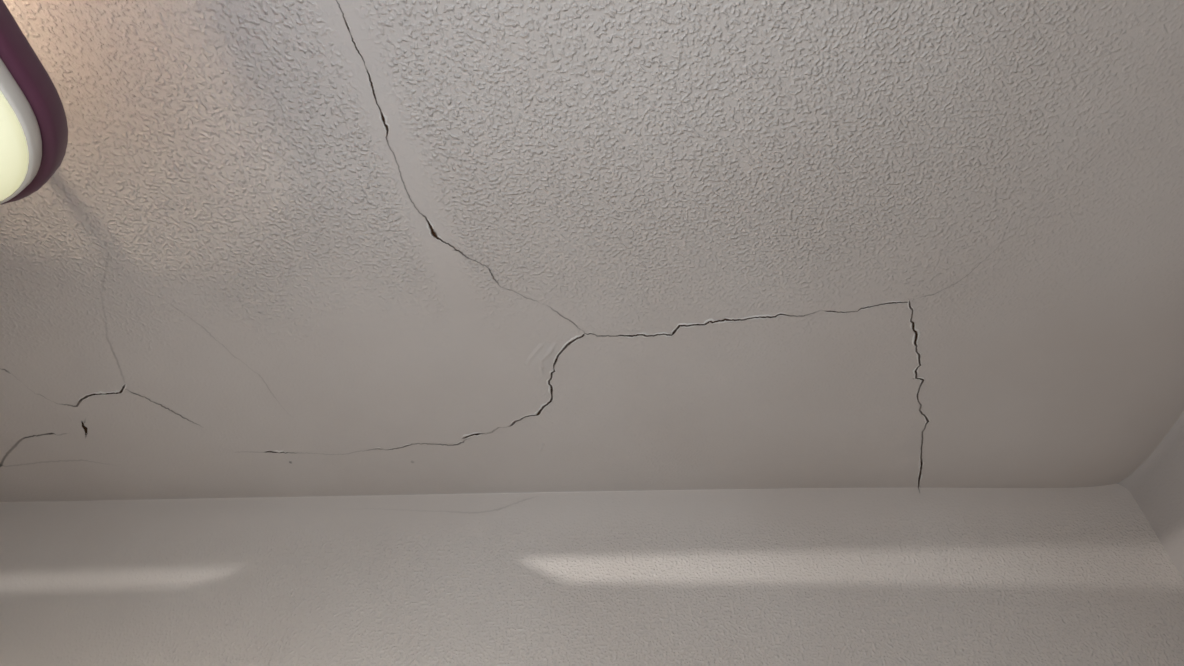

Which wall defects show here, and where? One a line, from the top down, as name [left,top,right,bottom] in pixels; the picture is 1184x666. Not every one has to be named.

crack [339,7,390,143]
crack [423,215,496,281]
crack [70,384,185,419]
crack [378,432,482,450]
crack [510,312,790,427]
crack [826,300,931,489]